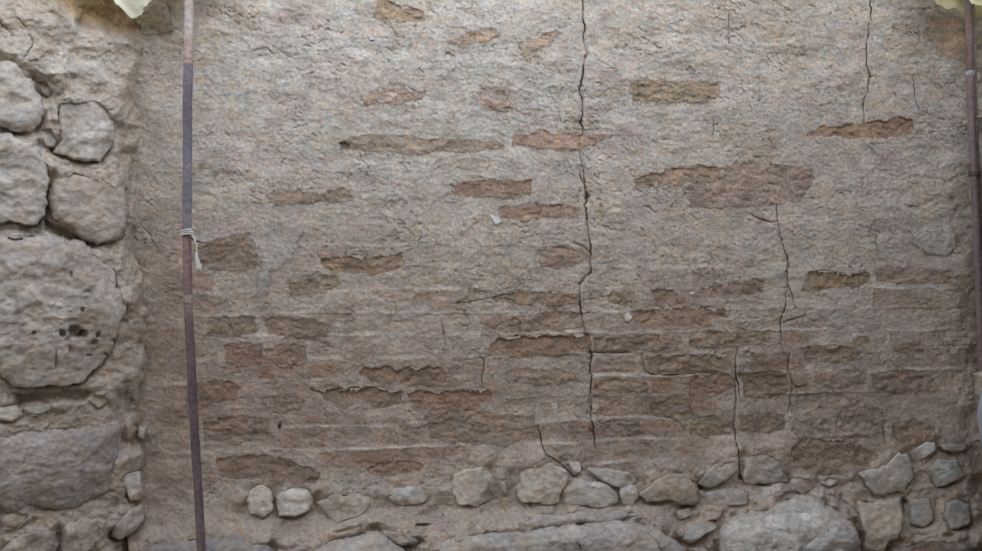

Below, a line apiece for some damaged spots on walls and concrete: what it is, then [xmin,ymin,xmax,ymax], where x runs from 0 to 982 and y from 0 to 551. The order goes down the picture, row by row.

spalling [344,129,613,155]
spalling [450,179,580,226]
crack [576,0,706,443]
spalling [631,77,721,104]
spalling [634,162,814,209]
crack [752,204,806,409]
spalling [806,116,914,139]
crack [862,0,872,122]
spalling [802,266,953,291]
spalling [202,366,537,484]
crack [652,350,741,475]
spalling [487,278,937,476]